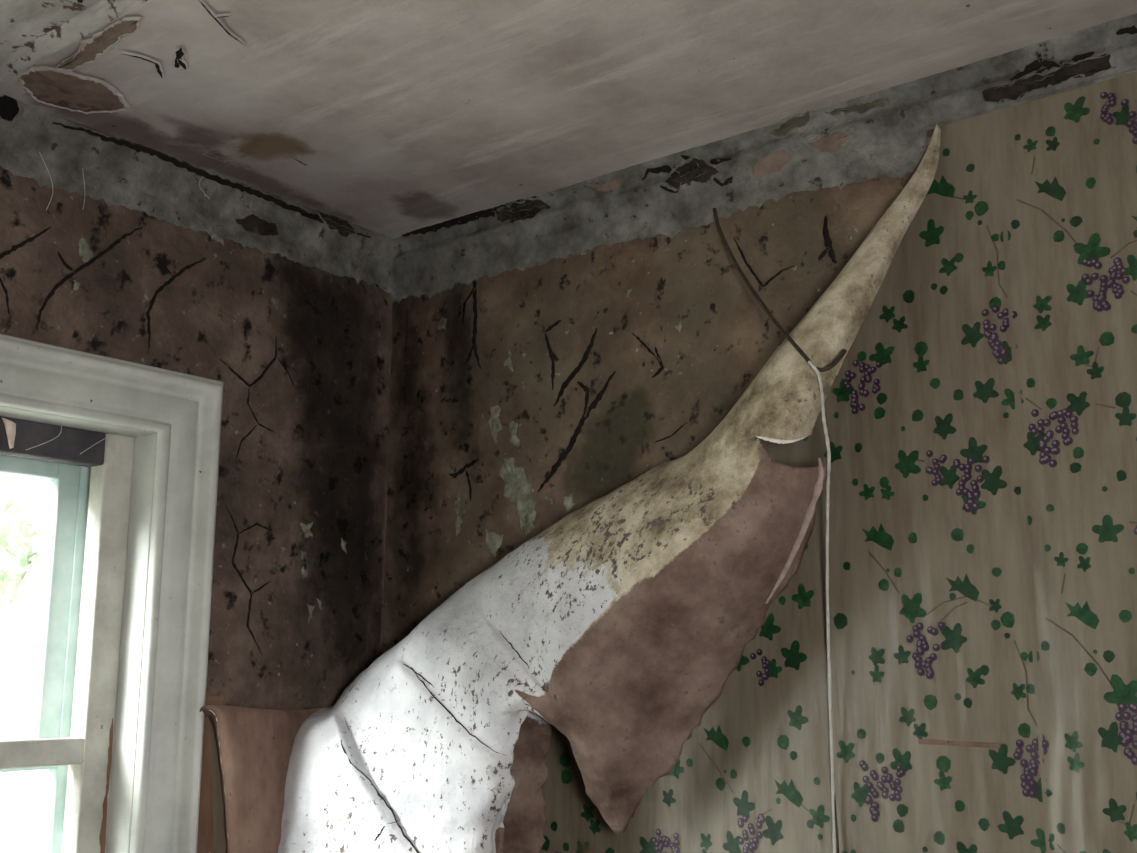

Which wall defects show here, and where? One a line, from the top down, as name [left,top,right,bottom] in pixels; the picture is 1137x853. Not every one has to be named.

flaking render [0,16,141,128]
flaking render [977,49,1119,106]
flaking render [231,210,282,238]
flaking render [492,197,556,227]
crack [0,225,144,330]
crack [144,257,207,354]
crack [631,332,666,379]
crack [537,319,617,493]
crack [449,458,479,501]
peeling [488,405,536,535]
crack [224,504,272,657]